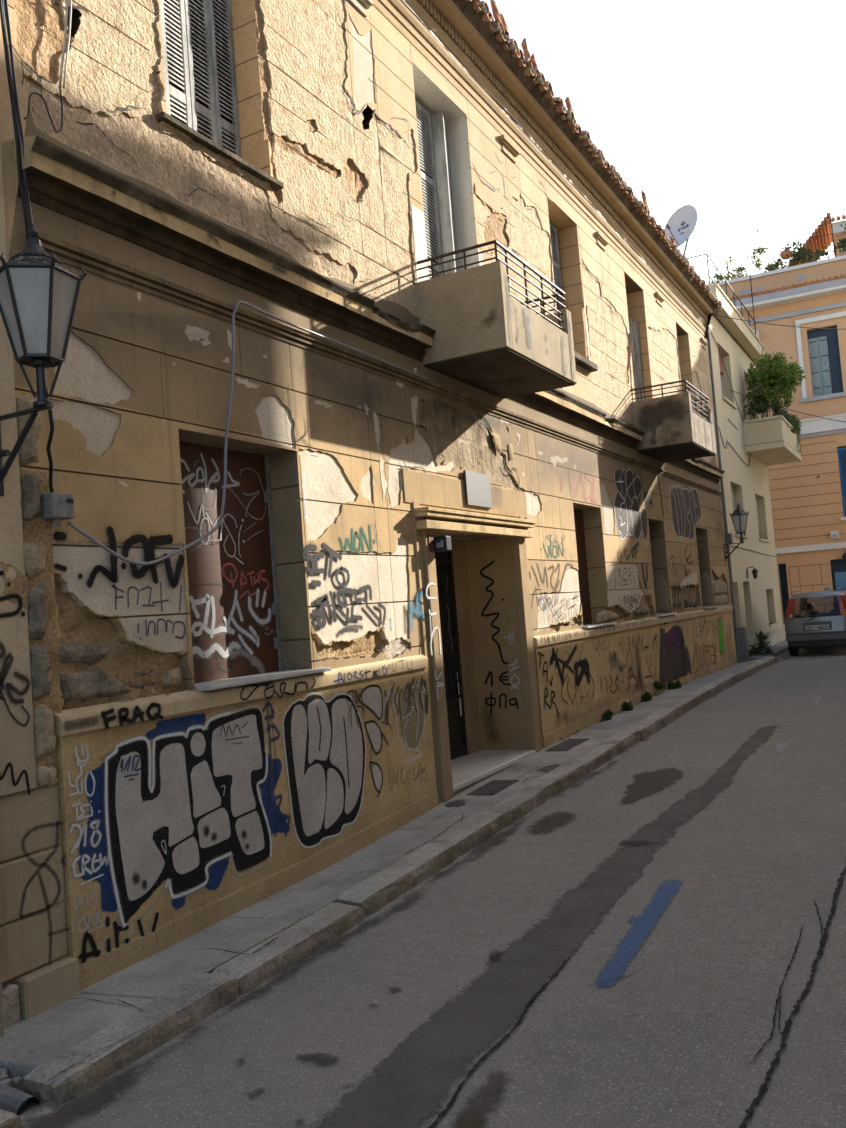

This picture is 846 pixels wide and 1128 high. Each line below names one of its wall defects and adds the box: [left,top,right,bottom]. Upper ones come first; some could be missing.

flaking render [14,0,418,317]
flaking render [49,332,131,456]
peeling [184,325,211,346]
flaking render [235,377,541,660]
peeling [538,450,577,469]
flaking render [52,541,188,710]